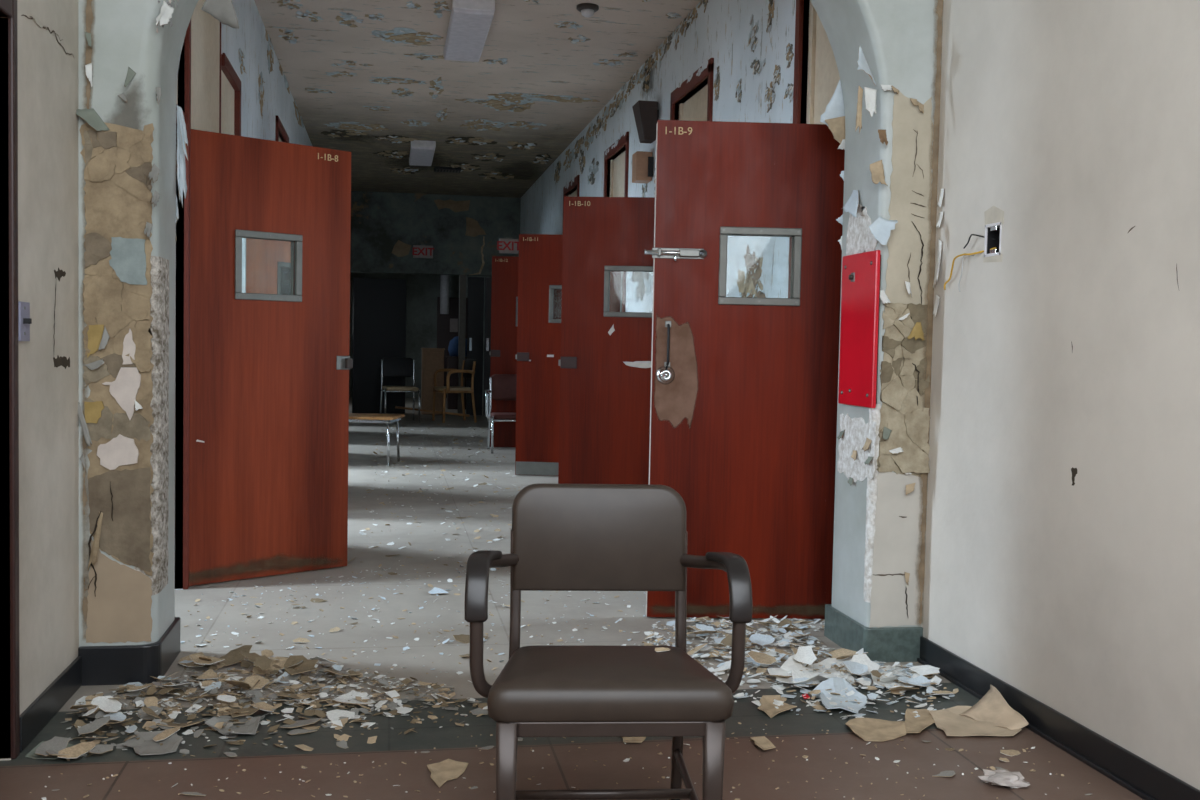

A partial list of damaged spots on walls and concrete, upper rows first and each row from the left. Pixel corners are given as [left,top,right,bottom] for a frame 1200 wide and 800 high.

crack [21,14,74,57]
peeling [238,0,444,128]
peeling [305,0,708,189]
peeling [678,61,720,101]
peeling [846,85,933,306]
peeling [53,122,170,595]
crack [873,572,910,616]